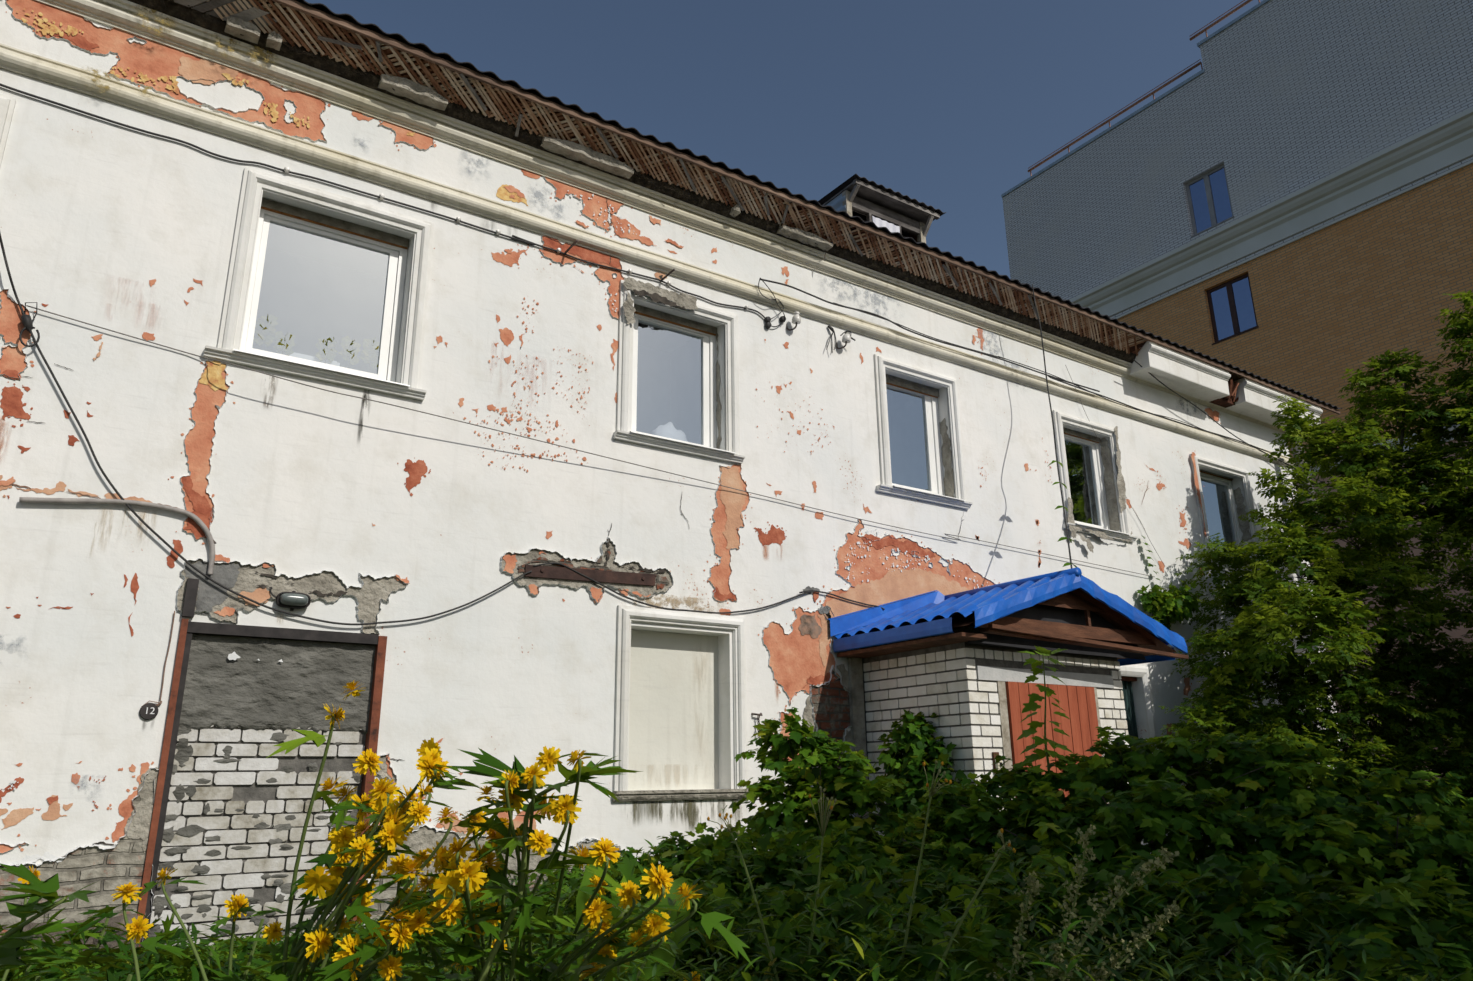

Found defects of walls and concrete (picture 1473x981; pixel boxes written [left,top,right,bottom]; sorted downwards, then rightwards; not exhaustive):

peeling [5,0,331,143]
peeling [496,169,684,254]
peeling [0,289,49,428]
peeling [458,297,593,472]
spalling [491,235,698,370]
peeling [0,475,152,503]
spalling [167,360,410,634]
spalling [499,531,674,604]
peeling [703,333,787,616]
peeling [758,504,1000,769]
spalling [0,761,159,937]
spalling [368,811,623,920]